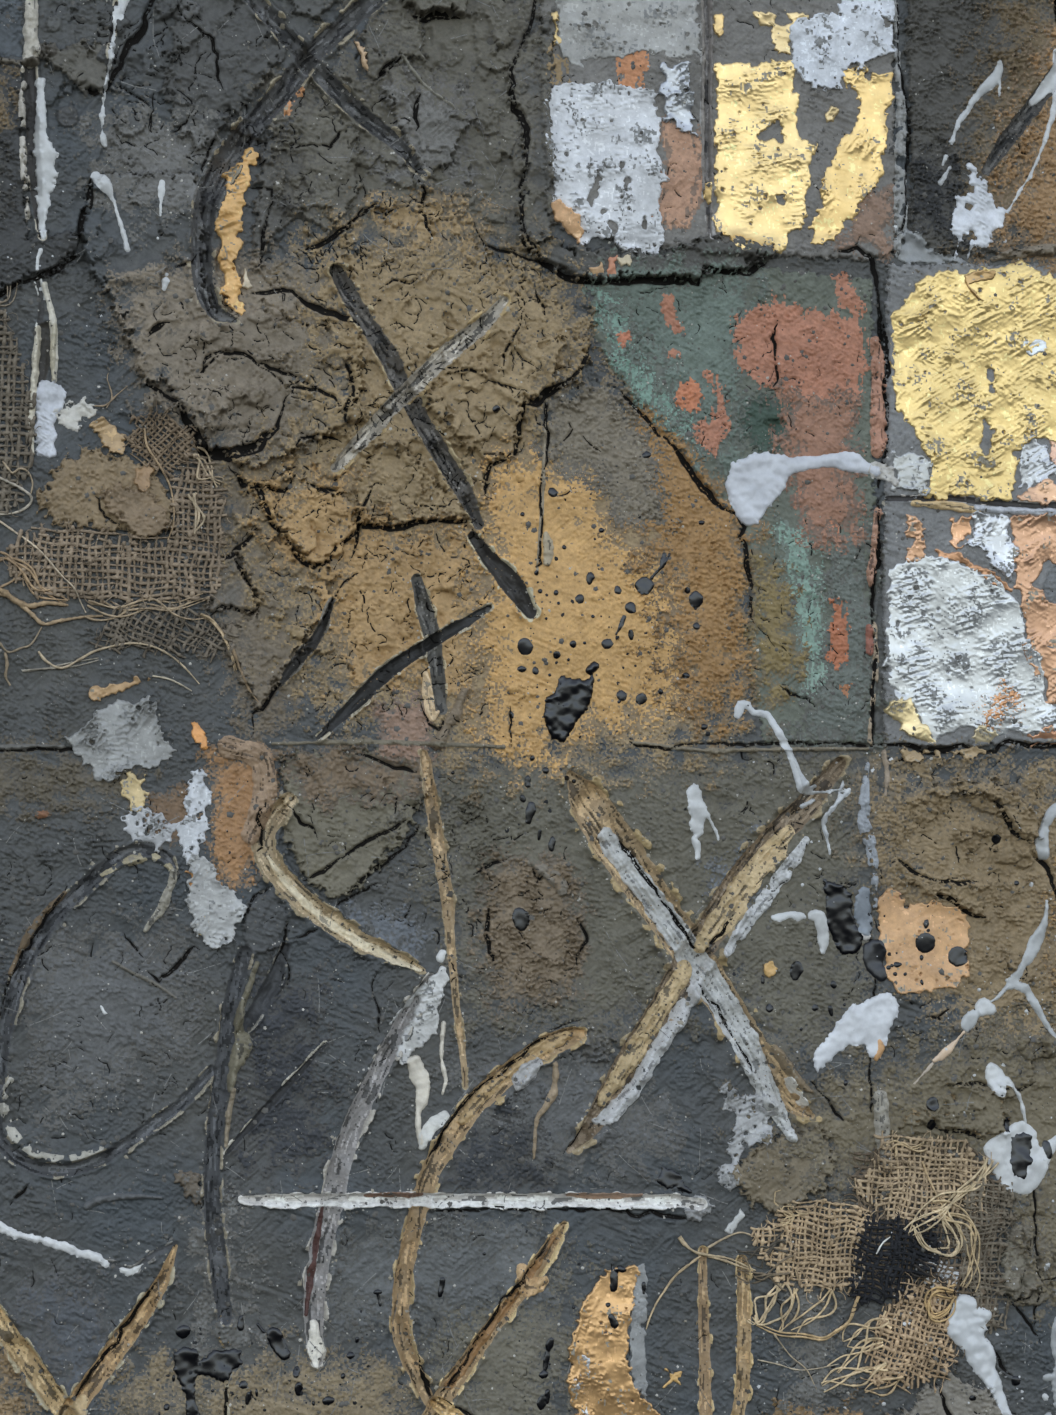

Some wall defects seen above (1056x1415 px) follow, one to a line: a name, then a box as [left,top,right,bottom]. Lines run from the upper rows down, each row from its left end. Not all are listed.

crack [0,747,73,781]
crack [0,773,245,1287]
crack [398,1292,470,1385]
crack [757,1339,863,1412]